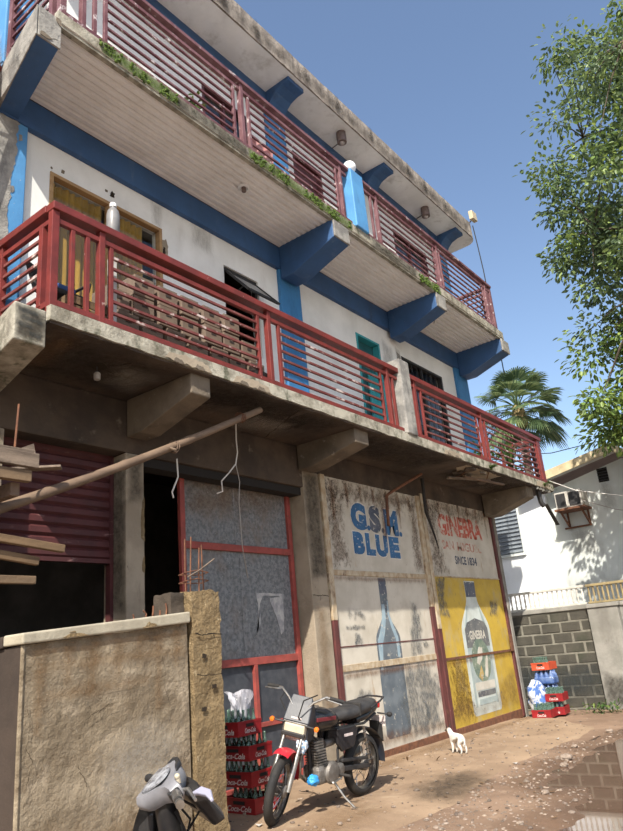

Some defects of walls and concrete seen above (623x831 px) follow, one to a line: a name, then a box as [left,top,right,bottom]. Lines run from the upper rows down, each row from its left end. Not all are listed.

peeling [0,113,23,240]
leakage [18,308,42,338]